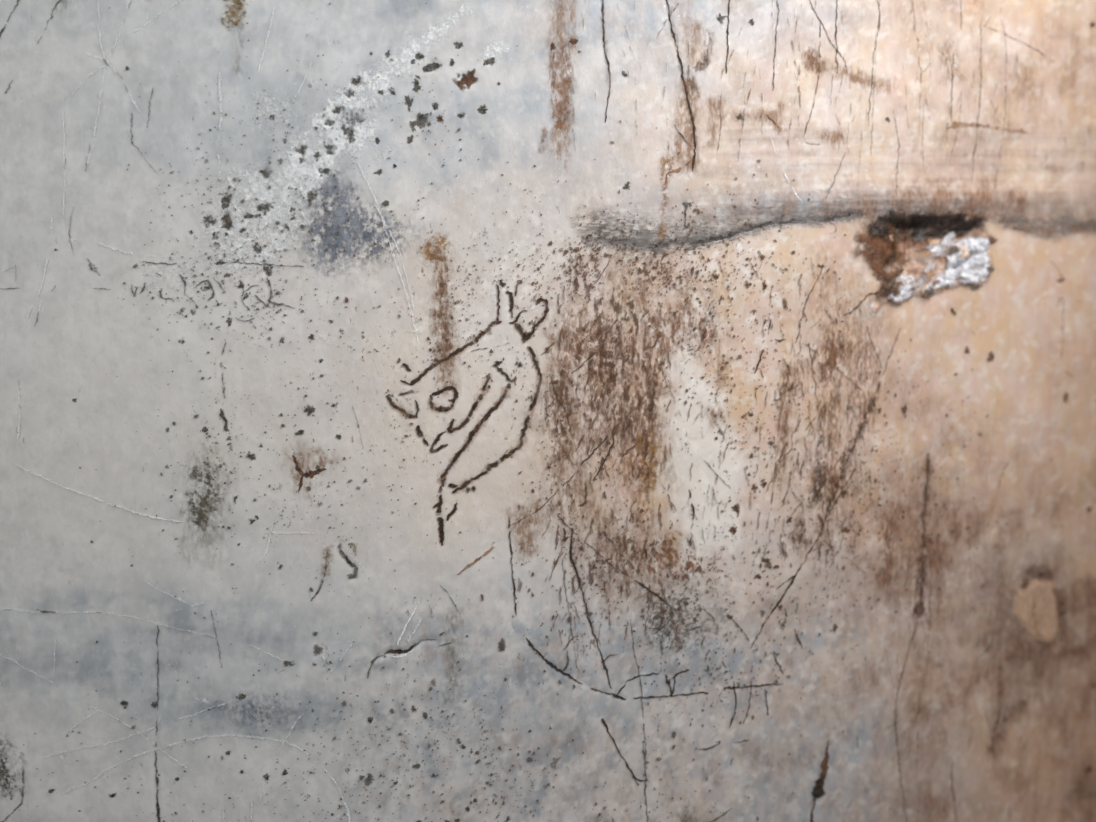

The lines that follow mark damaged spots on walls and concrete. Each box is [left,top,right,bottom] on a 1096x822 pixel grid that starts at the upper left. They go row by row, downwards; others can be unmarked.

rust [542,0,578,153]
rust [424,236,455,388]
rust [563,328,615,399]
rust [645,293,706,354]
spalling [844,210,998,316]
rust [603,427,658,488]
rust [615,536,702,584]
crack [153,625,161,822]